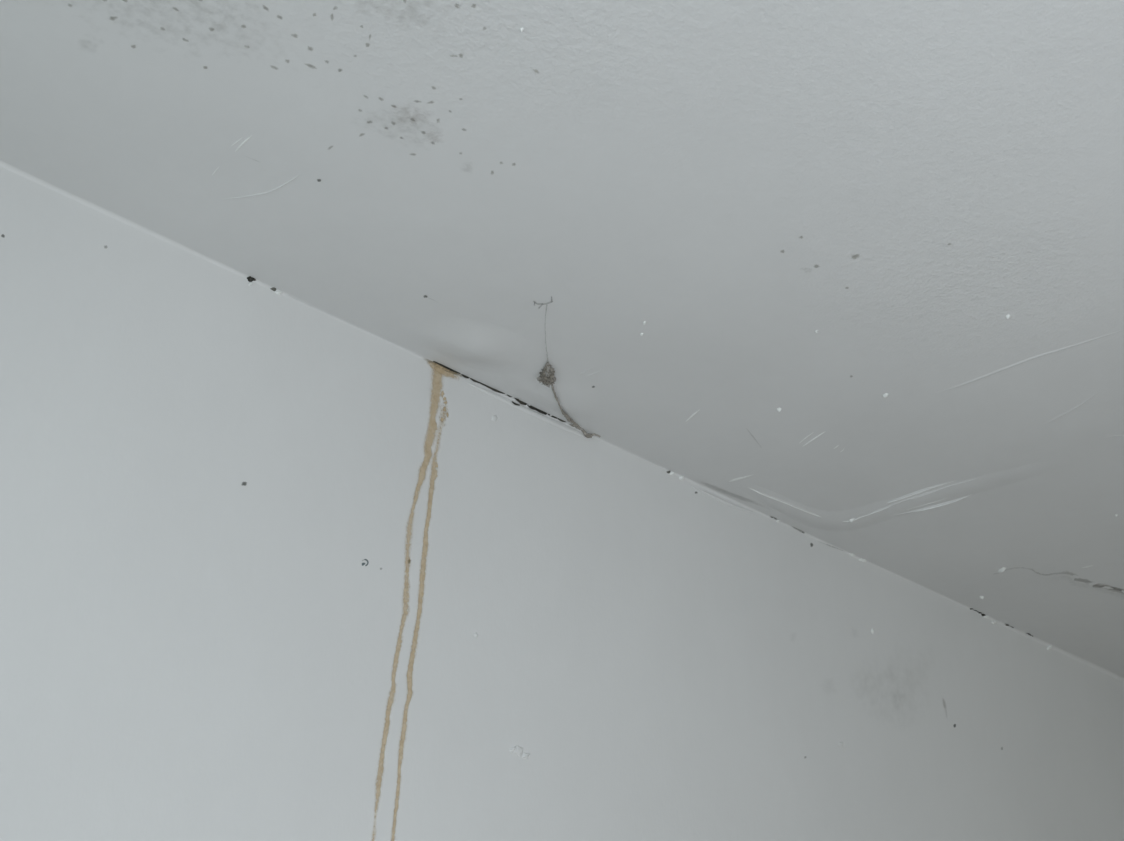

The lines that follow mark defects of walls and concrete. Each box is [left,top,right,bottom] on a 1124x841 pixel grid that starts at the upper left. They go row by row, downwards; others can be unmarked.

leakage [375,364,454,841]
crack [431,361,585,437]